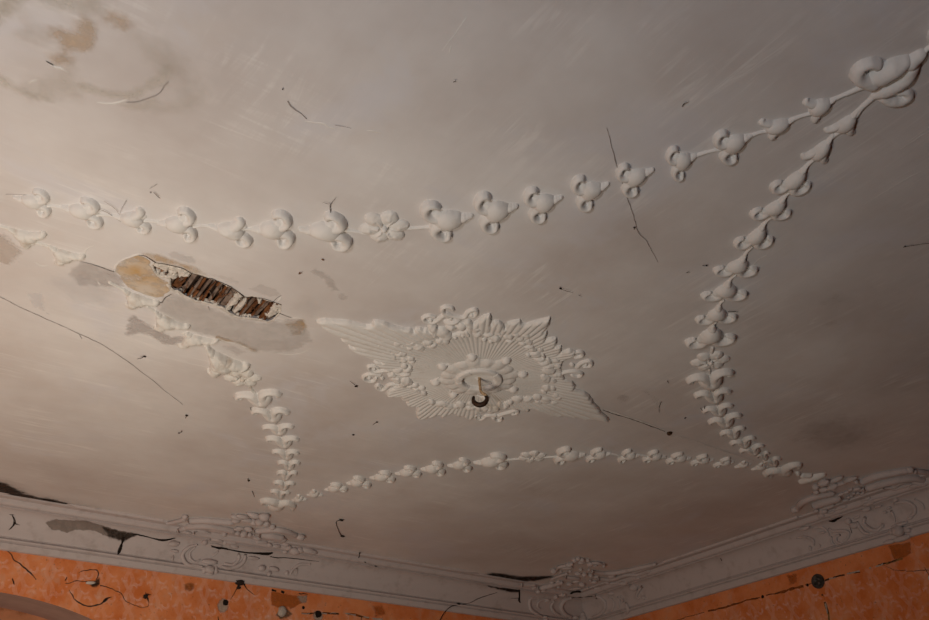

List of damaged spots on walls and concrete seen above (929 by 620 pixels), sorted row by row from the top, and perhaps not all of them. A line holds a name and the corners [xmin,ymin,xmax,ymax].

flaking render [83,246,304,334]
crack [8,515,36,579]
crack [117,534,175,554]
crack [211,545,319,562]